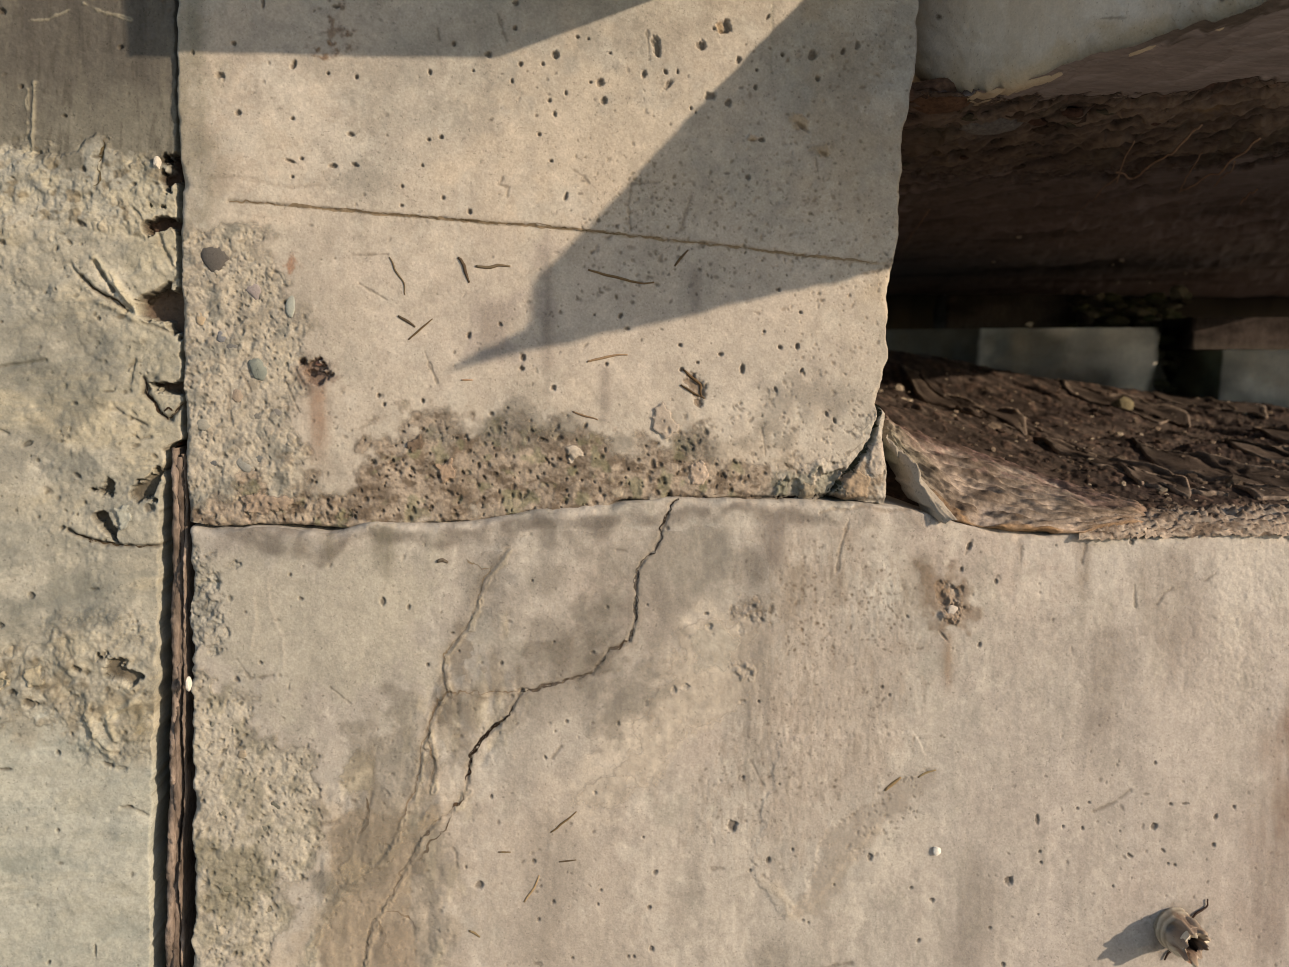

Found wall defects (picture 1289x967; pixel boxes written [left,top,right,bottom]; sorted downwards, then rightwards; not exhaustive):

spalling [153,155,184,191]
spalling [139,207,887,528]
spalling [92,466,166,541]
spalling [190,543,241,656]
spalling [0,629,58,728]
spalling [98,652,145,686]
crack [355,494,717,966]
spalling [185,669,327,967]